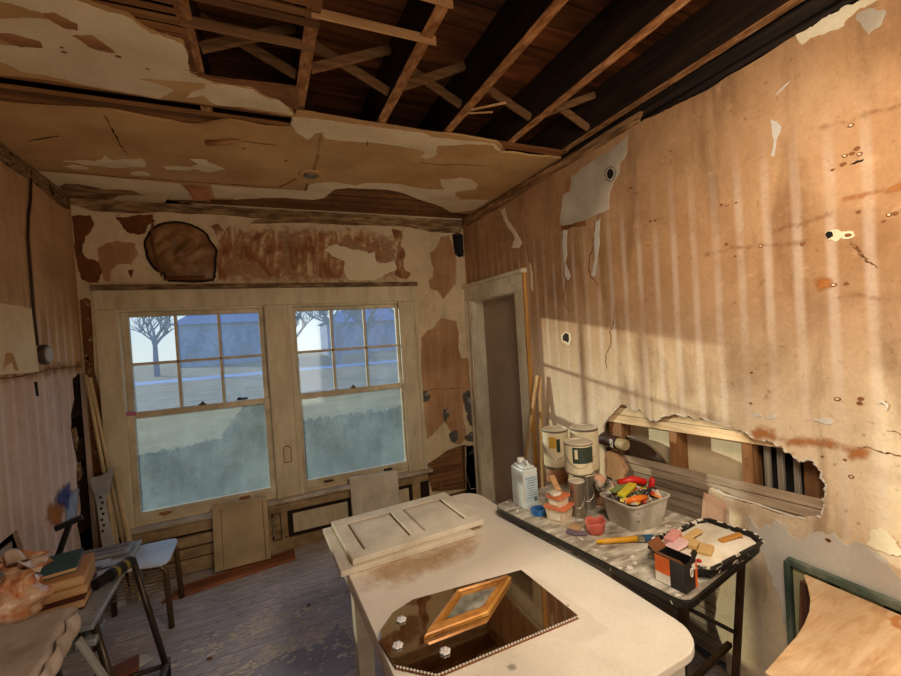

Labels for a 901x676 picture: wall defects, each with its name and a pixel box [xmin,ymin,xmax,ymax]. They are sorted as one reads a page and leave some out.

peeling [796,0,886,45]
peeling [39,156,204,204]
peeling [211,178,488,213]
flaking render [560,137,628,230]
flaking render [72,214,155,283]
peeling [324,244,397,281]
crack [0,366,82,379]
spalling [71,298,109,548]
flaking render [421,318,470,496]
crack [857,430,901,457]
spalling [601,404,901,624]
spalling [689,587,726,663]